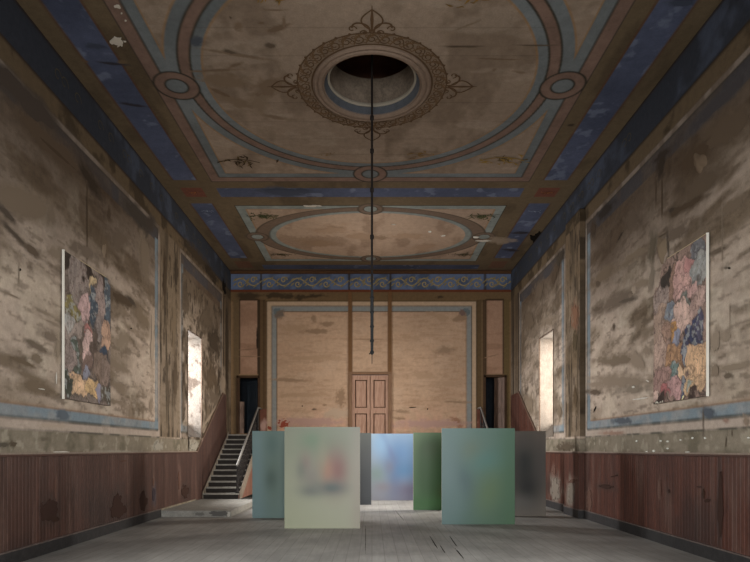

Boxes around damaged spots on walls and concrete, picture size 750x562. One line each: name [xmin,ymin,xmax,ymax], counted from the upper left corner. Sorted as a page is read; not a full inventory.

leakage [163,258,178,295]
peeling [552,478,574,503]